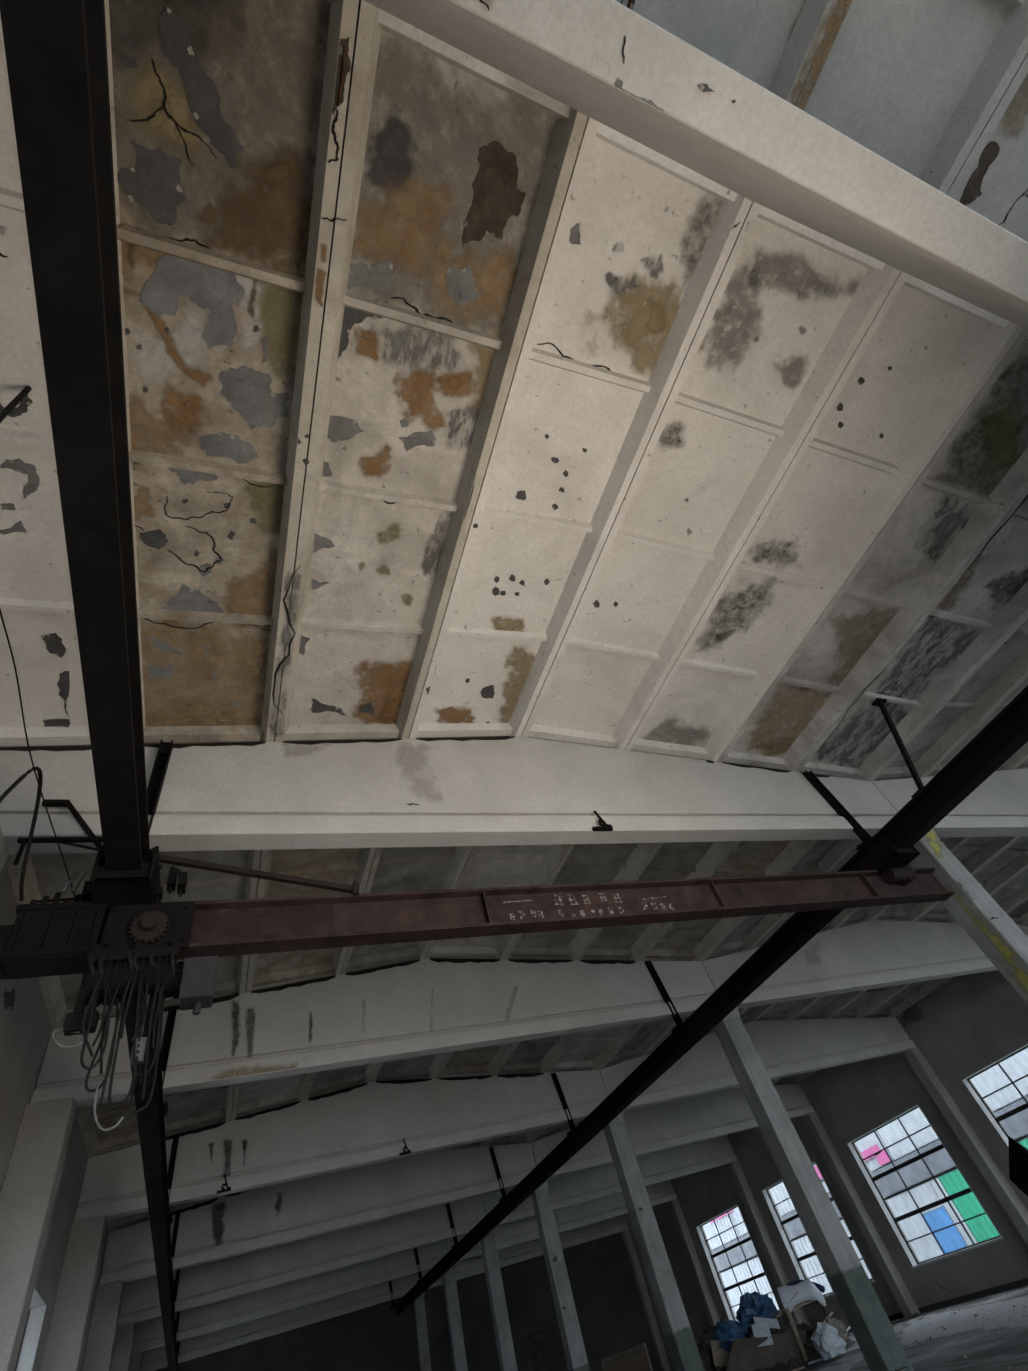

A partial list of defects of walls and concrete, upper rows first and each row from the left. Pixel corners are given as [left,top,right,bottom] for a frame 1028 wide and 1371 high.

corrosion [791,0,853,111]
spalling [462,141,526,247]
water stain [685,202,721,275]
spalling [960,141,1000,206]
water stain [604,283,680,373]
peeling [139,255,289,504]
peeling [399,406,479,452]
peeling [0,458,40,535]
crack [135,471,274,573]
water stain [929,555,980,617]
peeling [41,633,71,728]
water stain [749,609,895,756]